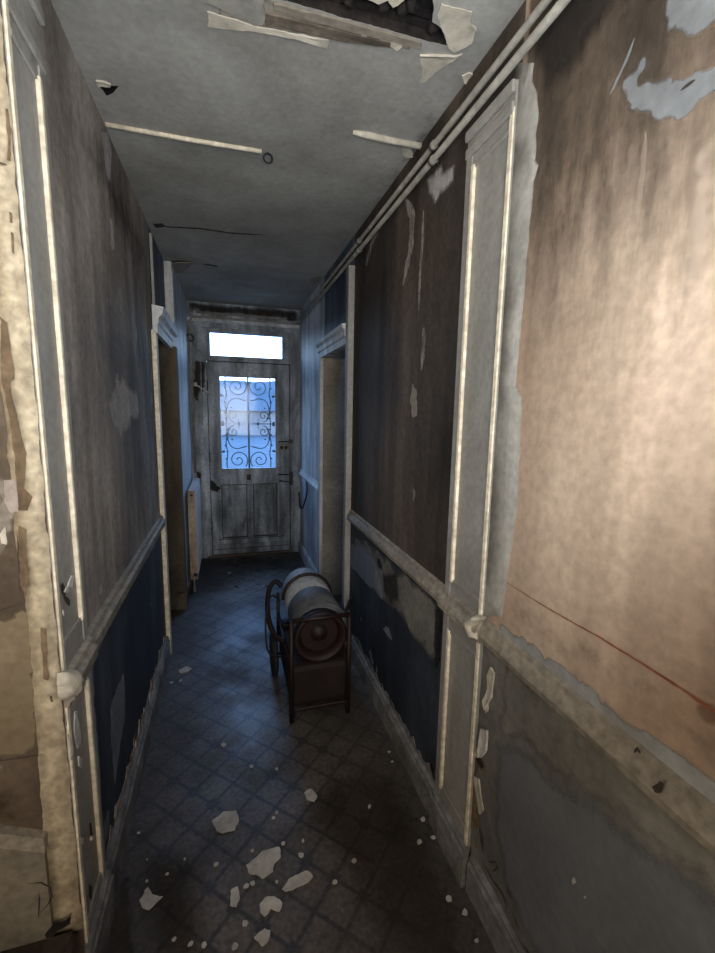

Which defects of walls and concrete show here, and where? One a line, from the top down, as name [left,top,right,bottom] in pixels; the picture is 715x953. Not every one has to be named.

flaking render [202,0,477,83]
peeling [0,109,11,165]
peeling [0,317,32,511]
peeling [18,526,29,597]
peeling [60,575,74,616]
peeling [40,628,50,681]
flaking render [482,667,495,713]
flaking render [466,729,489,849]
leakage [501,667,715,888]